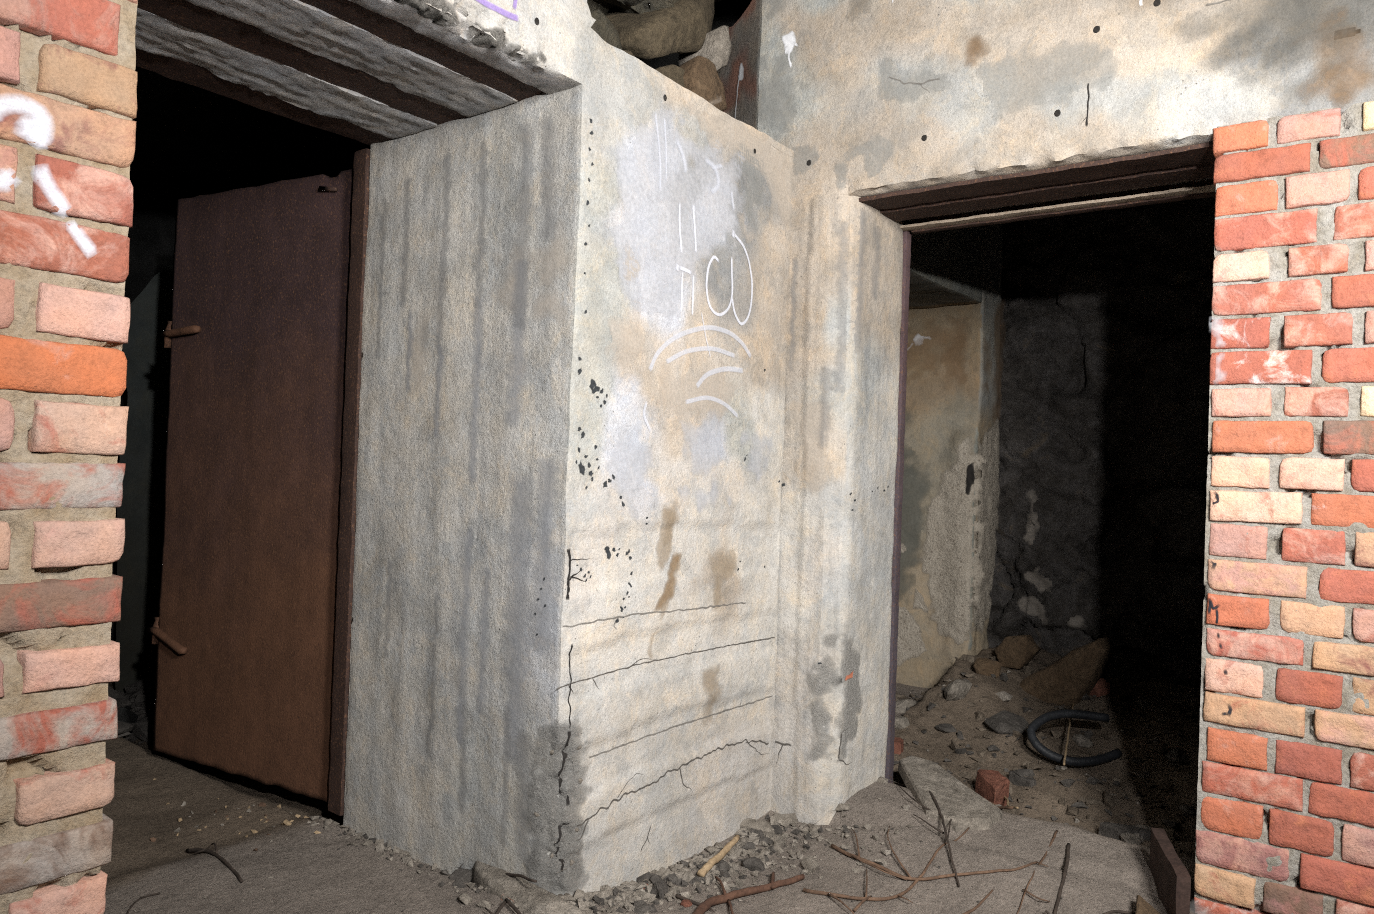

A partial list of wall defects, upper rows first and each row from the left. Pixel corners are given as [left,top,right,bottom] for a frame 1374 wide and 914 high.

spalling [394,0,546,67]
crack [557,549,775,728]
rust [657,555,680,608]
spalling [897,420,1000,666]
crack [572,696,791,841]